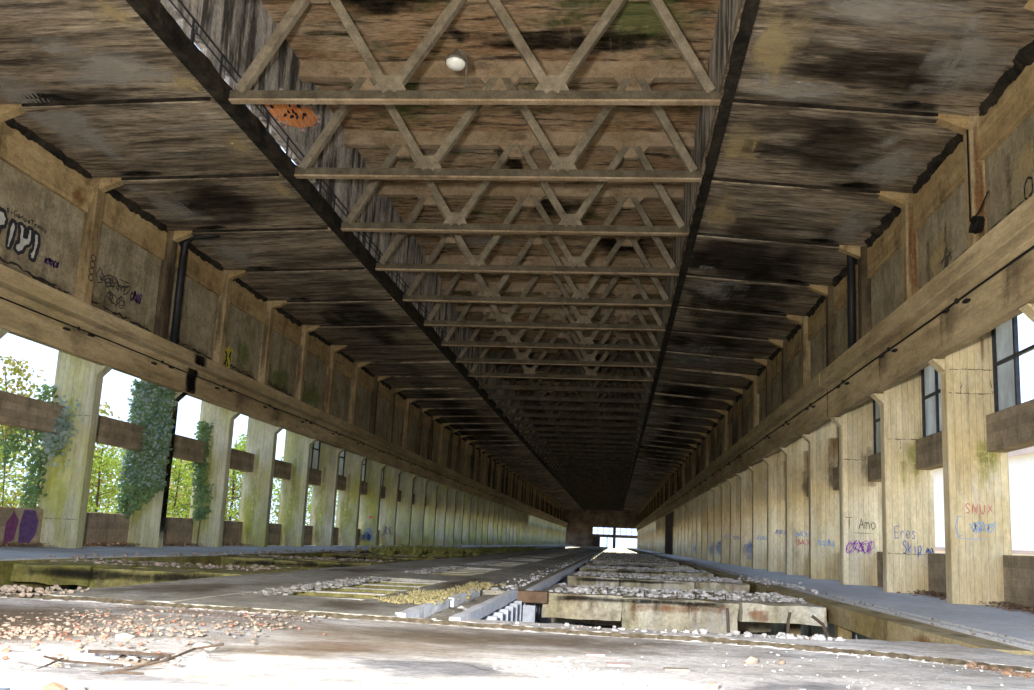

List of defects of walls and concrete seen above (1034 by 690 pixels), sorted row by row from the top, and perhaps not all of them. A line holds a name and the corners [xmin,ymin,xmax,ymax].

damp [891,101,935,110]